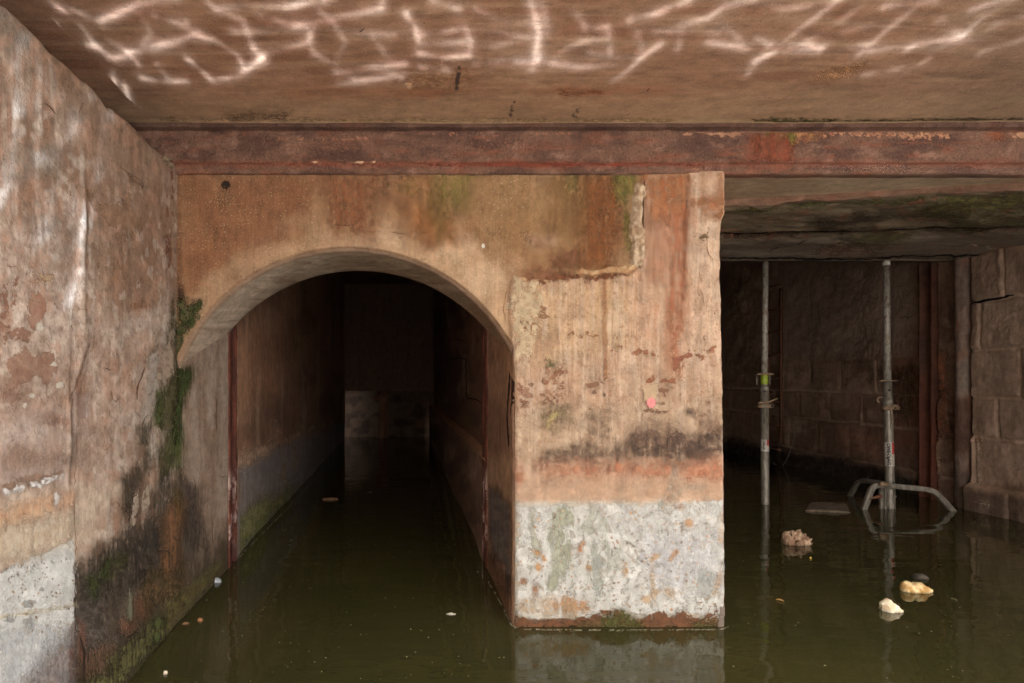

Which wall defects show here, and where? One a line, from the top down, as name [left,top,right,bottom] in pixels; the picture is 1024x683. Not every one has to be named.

flaking render [0,272,66,403]
corrosion [394,163,725,375]
flaking render [506,182,717,432]
water stain [722,207,987,237]
peeling [771,132,950,140]
water stain [880,366,916,423]
water stain [0,467,209,683]
water stain [488,401,916,620]